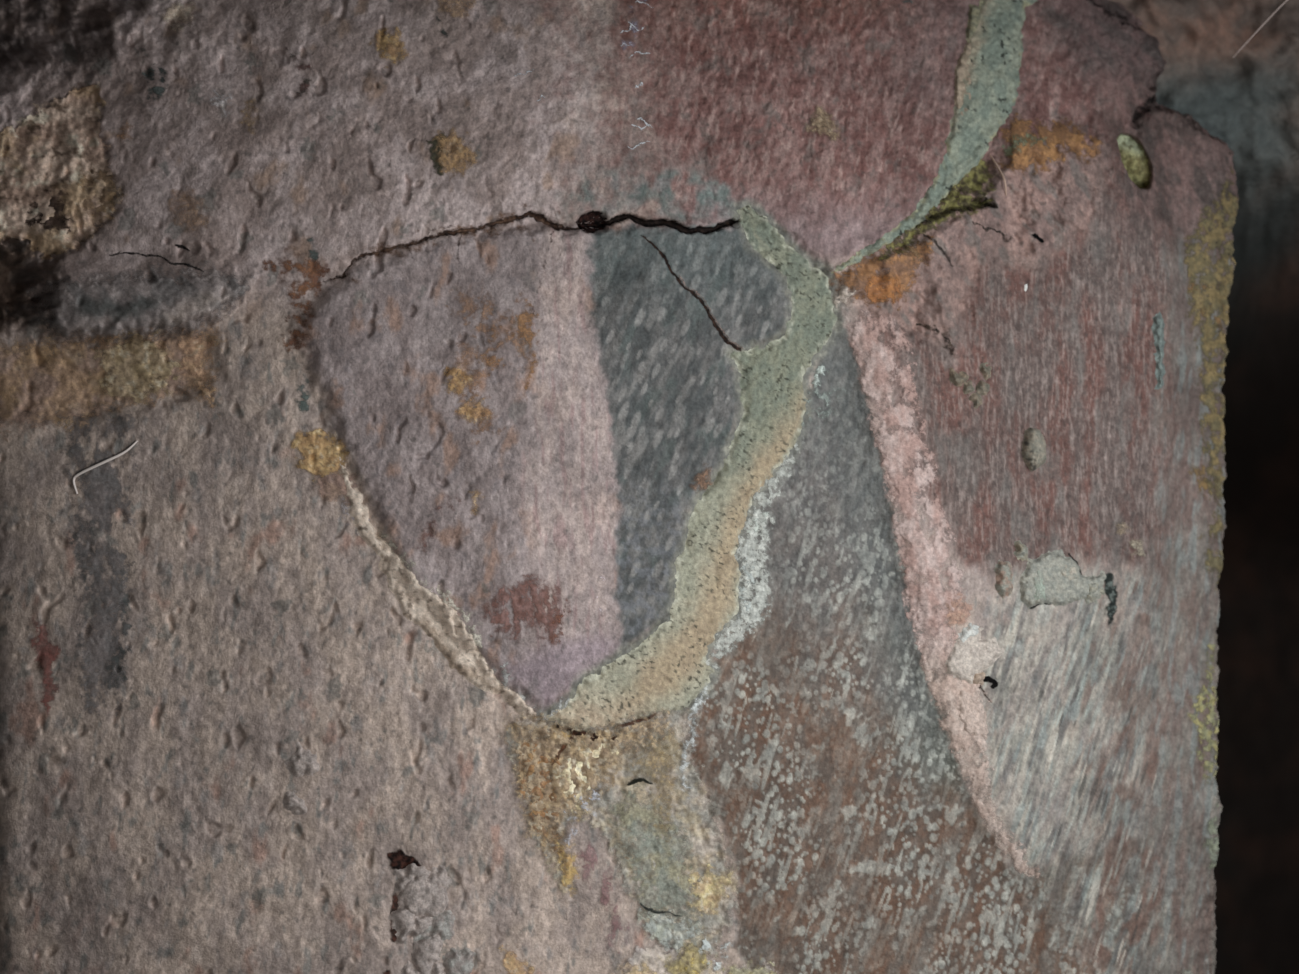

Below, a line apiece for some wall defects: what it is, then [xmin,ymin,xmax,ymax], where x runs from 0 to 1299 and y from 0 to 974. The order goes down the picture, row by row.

crack [331,204,742,351]
flaking render [994,540,1118,624]
flaking render [282,742,320,815]
flaking render [383,849,476,974]